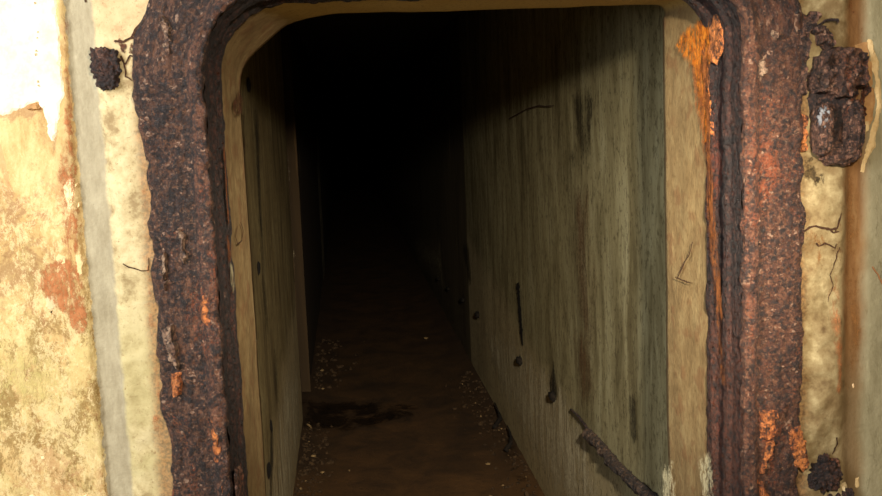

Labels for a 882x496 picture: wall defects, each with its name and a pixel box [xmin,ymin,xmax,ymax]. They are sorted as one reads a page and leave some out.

peeling [0,0,65,141]
peeling [855,39,882,172]
corrosion [38,67,87,334]
corrosion [676,22,723,354]
crack [804,213,842,301]